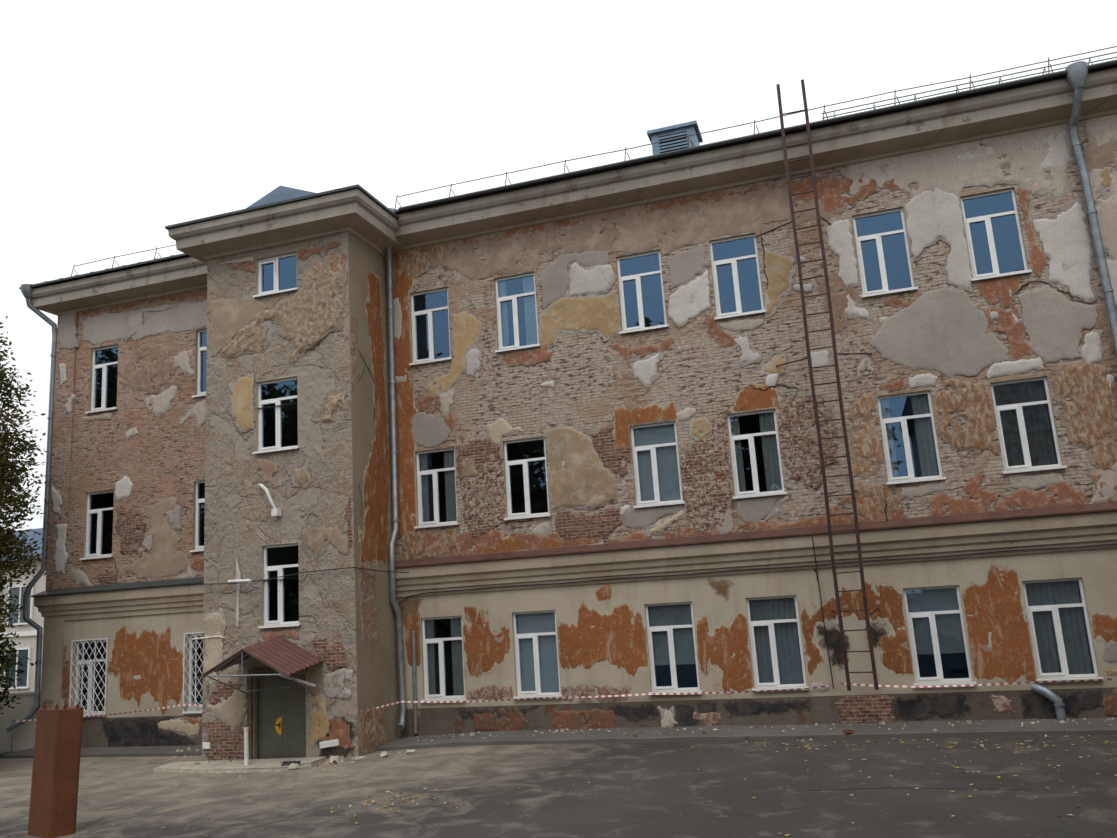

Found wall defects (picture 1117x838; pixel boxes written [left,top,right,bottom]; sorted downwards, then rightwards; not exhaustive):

peeling [81,288,207,316]
peeling [210,241,347,363]
peeling [977,187,1047,360]
peeling [346,174,907,567]
peeling [928,359,1117,517]
peeling [107,625,247,760]
peeling [320,705,386,755]
peeling [462,606,534,732]
peeling [552,583,650,730]
peeling [695,611,754,697]
peeling [798,581,915,682]
peeling [961,561,1038,713]